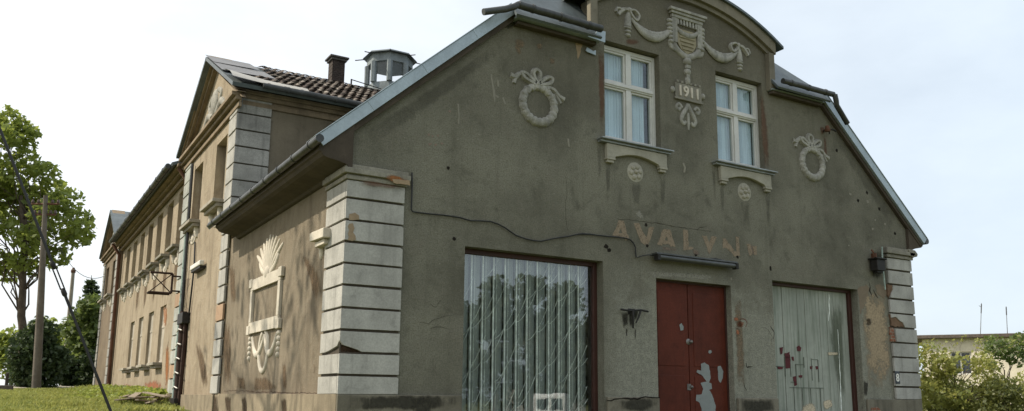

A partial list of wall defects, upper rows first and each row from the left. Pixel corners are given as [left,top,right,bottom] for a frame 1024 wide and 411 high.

spalling [348,213,359,241]
spalling [888,314,904,342]
water stain [361,396,441,411]